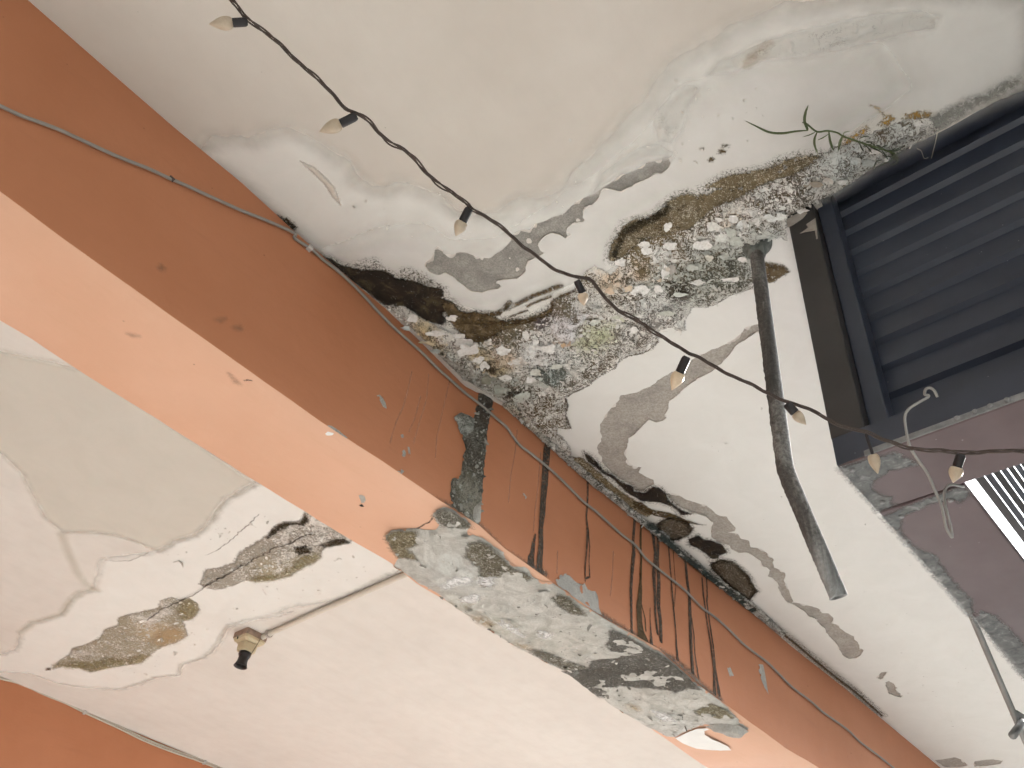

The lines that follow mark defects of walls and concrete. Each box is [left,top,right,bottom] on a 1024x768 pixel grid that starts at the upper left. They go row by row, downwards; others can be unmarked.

leakage [206,0,1024,344]
flaking render [47,597,200,672]
crack [148,534,312,619]
flaking render [200,512,351,589]
flaking render [385,116,938,751]
leakage [478,221,1024,768]